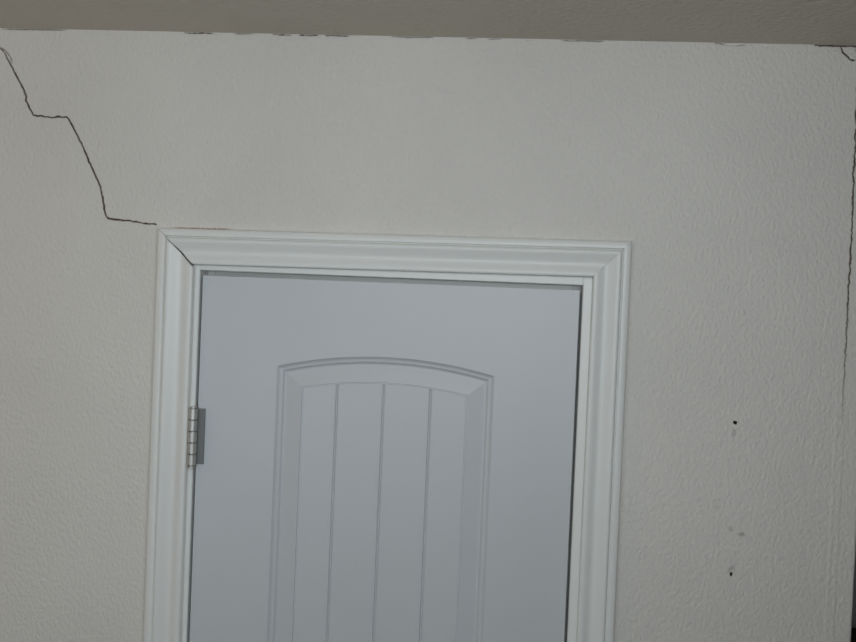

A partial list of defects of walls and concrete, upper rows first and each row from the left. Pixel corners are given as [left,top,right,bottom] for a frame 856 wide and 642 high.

crack [0,48,157,225]
crack [815,45,856,61]
crack [845,110,856,352]